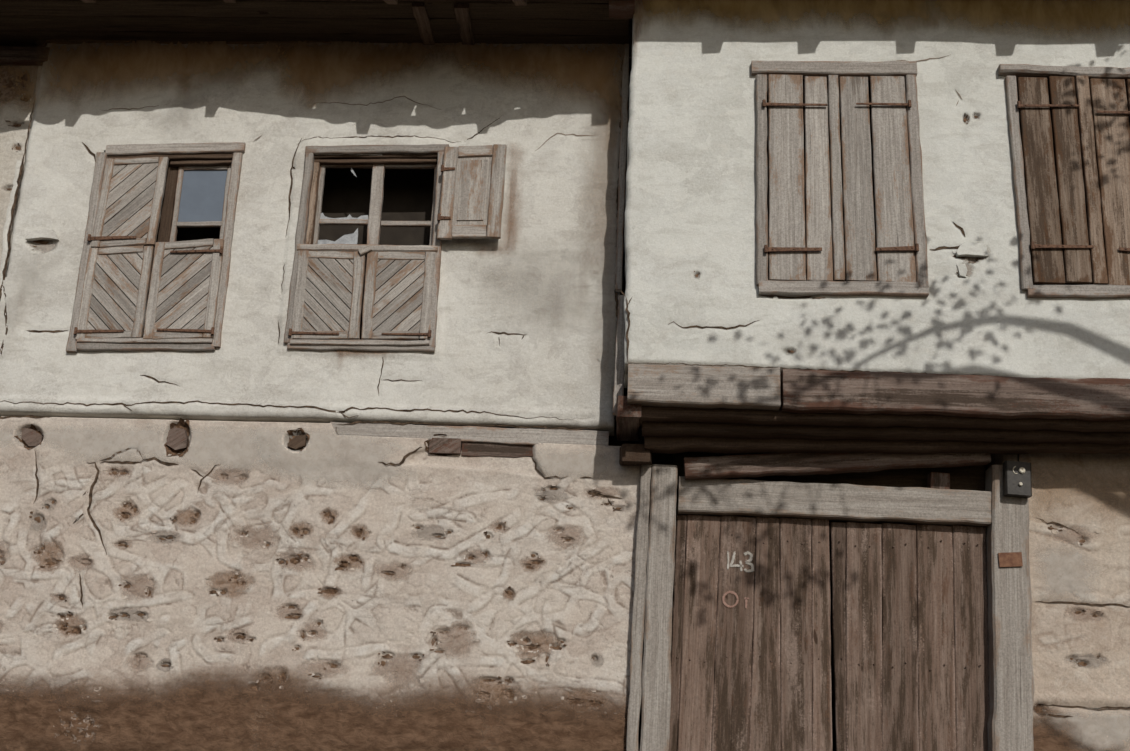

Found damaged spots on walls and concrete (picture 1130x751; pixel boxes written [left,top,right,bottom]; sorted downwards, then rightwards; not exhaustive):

leakage [640,0,1130,33]
crack [0,96,67,355]
crack [281,119,498,287]
crack [535,59,926,373]
crack [930,221,965,251]
spalling [952,242,988,278]
crack [488,331,527,346]
crack [0,357,594,471]
crack [32,452,40,504]
crack [74,447,221,554]
crack [532,457,622,511]
crack [1036,600,1130,608]